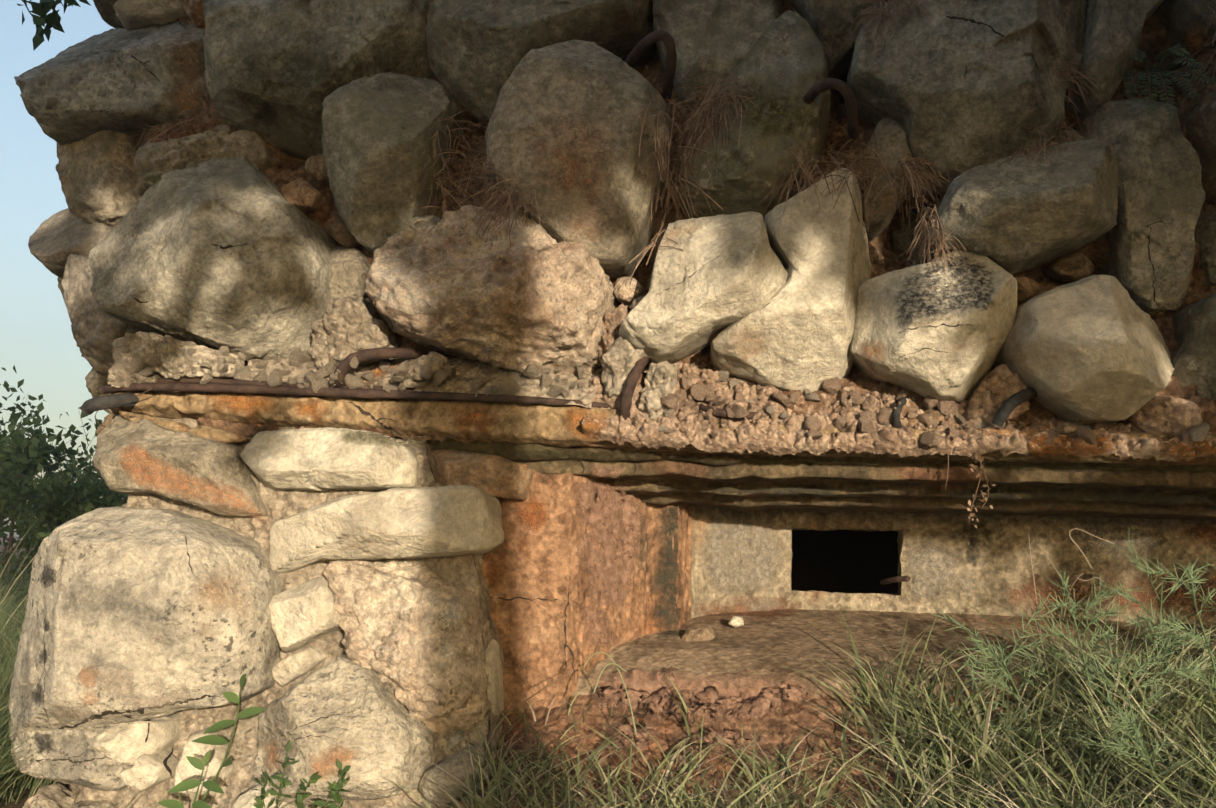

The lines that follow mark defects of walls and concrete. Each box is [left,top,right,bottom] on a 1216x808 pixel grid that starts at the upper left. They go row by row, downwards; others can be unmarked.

corrosion [207,393,271,419]
crack [349,402,404,437]
corrosion [1028,431,1113,461]
crack [478,592,575,677]